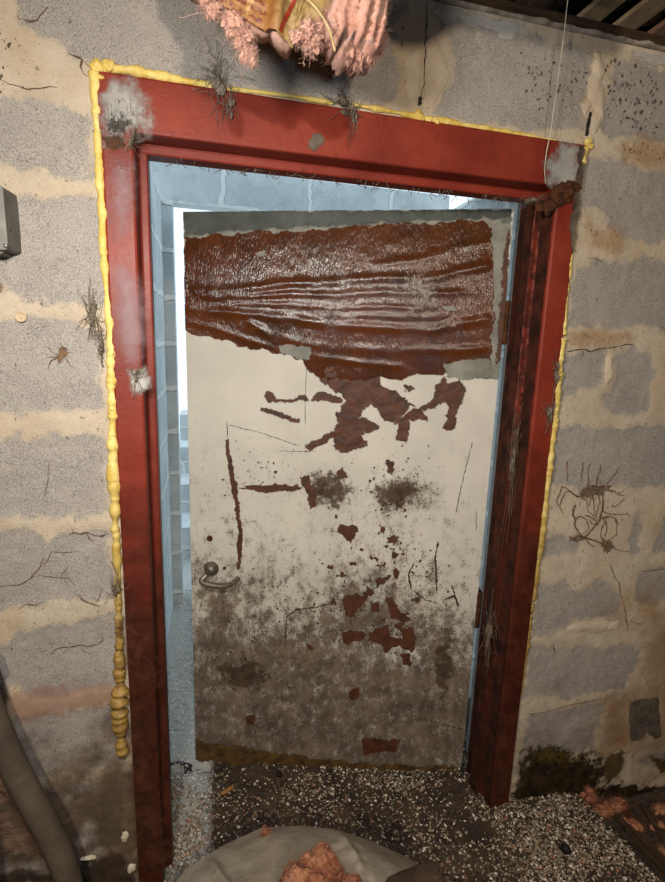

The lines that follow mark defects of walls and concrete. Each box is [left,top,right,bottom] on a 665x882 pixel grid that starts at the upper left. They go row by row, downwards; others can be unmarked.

crack [420,4,428,105]
peeling [260,365,466,453]
peeling [244,475,317,508]
corrosion [183,145,586,805]
peeling [313,514,422,666]
damp [195,740,462,771]
peeling [360,737,401,756]
damp [511,745,659,801]
damp [651,756,665,773]